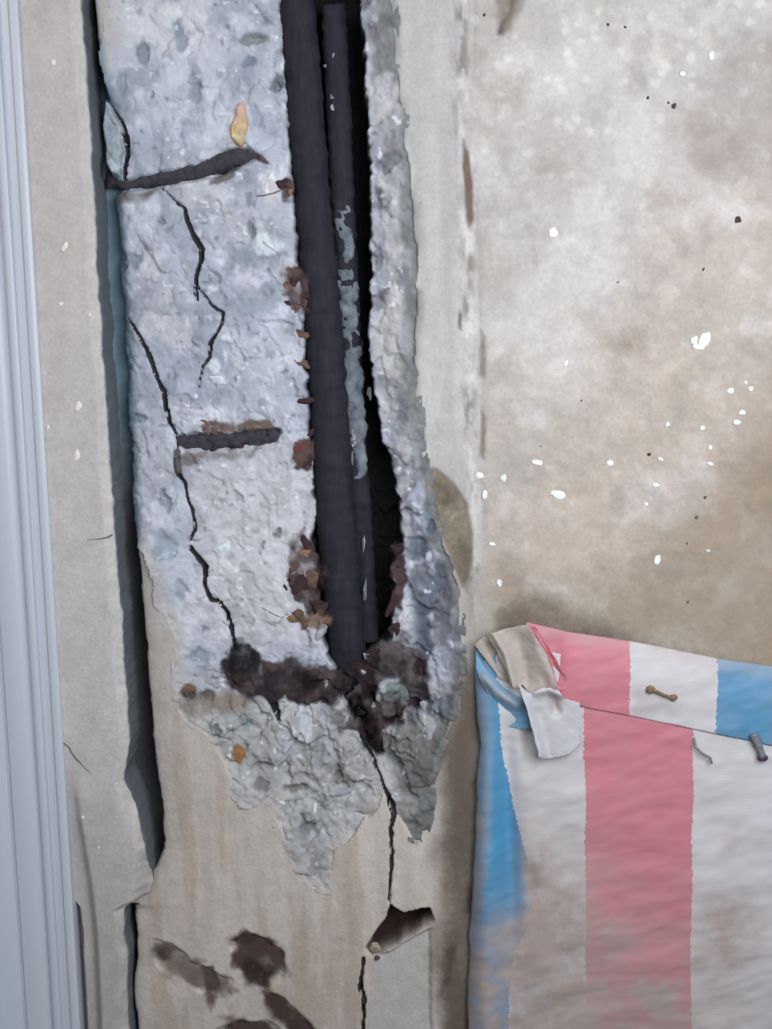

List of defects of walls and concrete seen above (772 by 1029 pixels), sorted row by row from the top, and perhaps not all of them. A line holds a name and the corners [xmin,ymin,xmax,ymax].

leakage [497,0,520,32]
corrosion [210,167,239,183]
crack [90,25,237,853]
corrosion [174,419,280,473]
spalling [99,0,471,894]
corrosion [180,533,439,787]
crack [360,734,397,902]
spalling [370,904,421,960]
crack [358,957,366,1029]